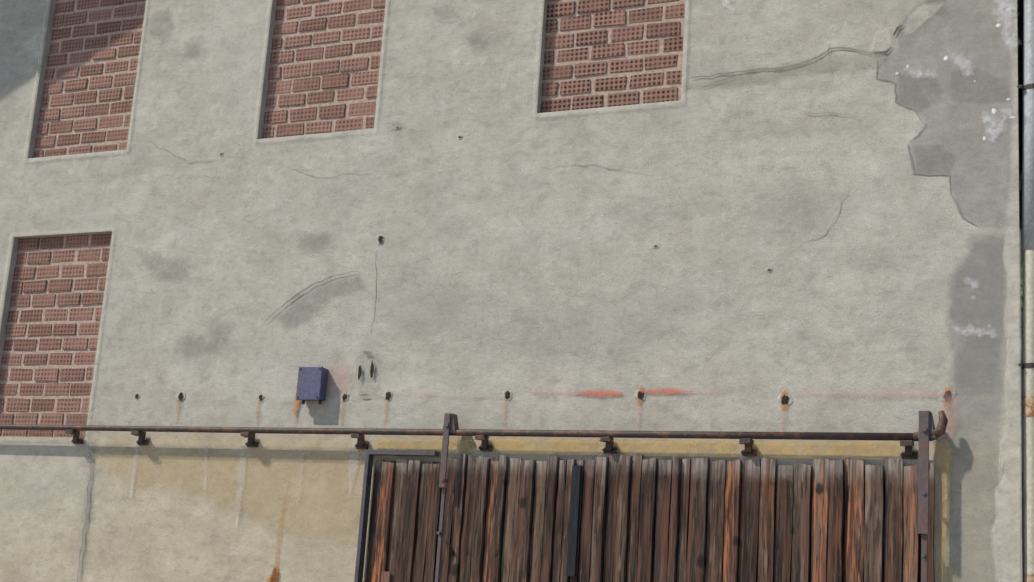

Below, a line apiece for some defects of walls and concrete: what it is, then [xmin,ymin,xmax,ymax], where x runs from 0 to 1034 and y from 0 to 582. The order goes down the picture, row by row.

crack [692,24,903,87]
corrosion [376,439,905,458]